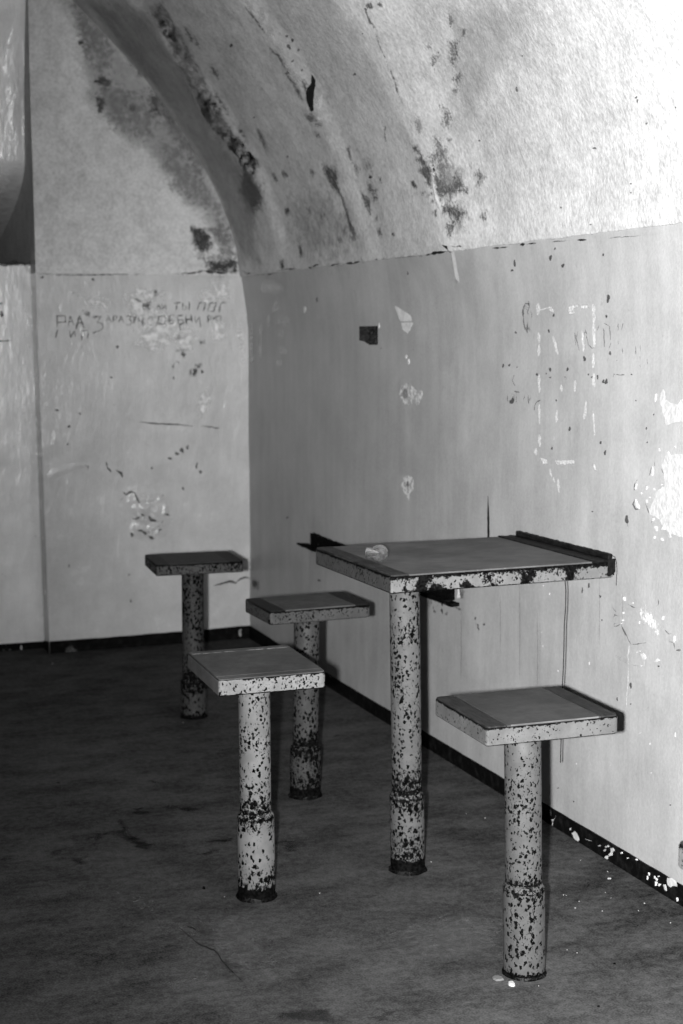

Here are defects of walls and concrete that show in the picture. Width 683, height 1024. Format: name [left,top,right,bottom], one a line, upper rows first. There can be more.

damp [241,169,262,212]
damp [411,139,485,235]
damp [190,226,238,272]
spalling [359,323,381,349]
peeling [395,306,413,334]
peeling [653,389,683,426]
peeling [625,446,683,541]
peeling [569,828,638,860]
peeling [647,872,679,901]